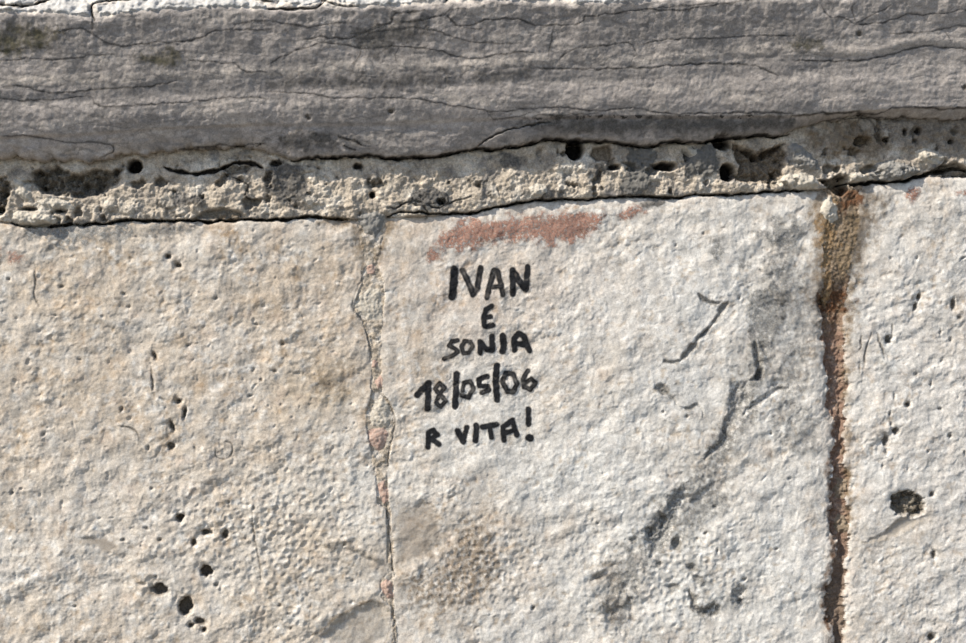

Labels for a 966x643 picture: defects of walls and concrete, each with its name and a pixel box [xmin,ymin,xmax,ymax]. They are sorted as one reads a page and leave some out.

crack [22,82,178,107]
crack [293,98,961,162]
crack [12,143,348,228]
crack [388,190,804,217]
crack [835,174,938,187]
rust [814,215,848,313]
crack [664,293,728,364]
damp [606,216,806,619]